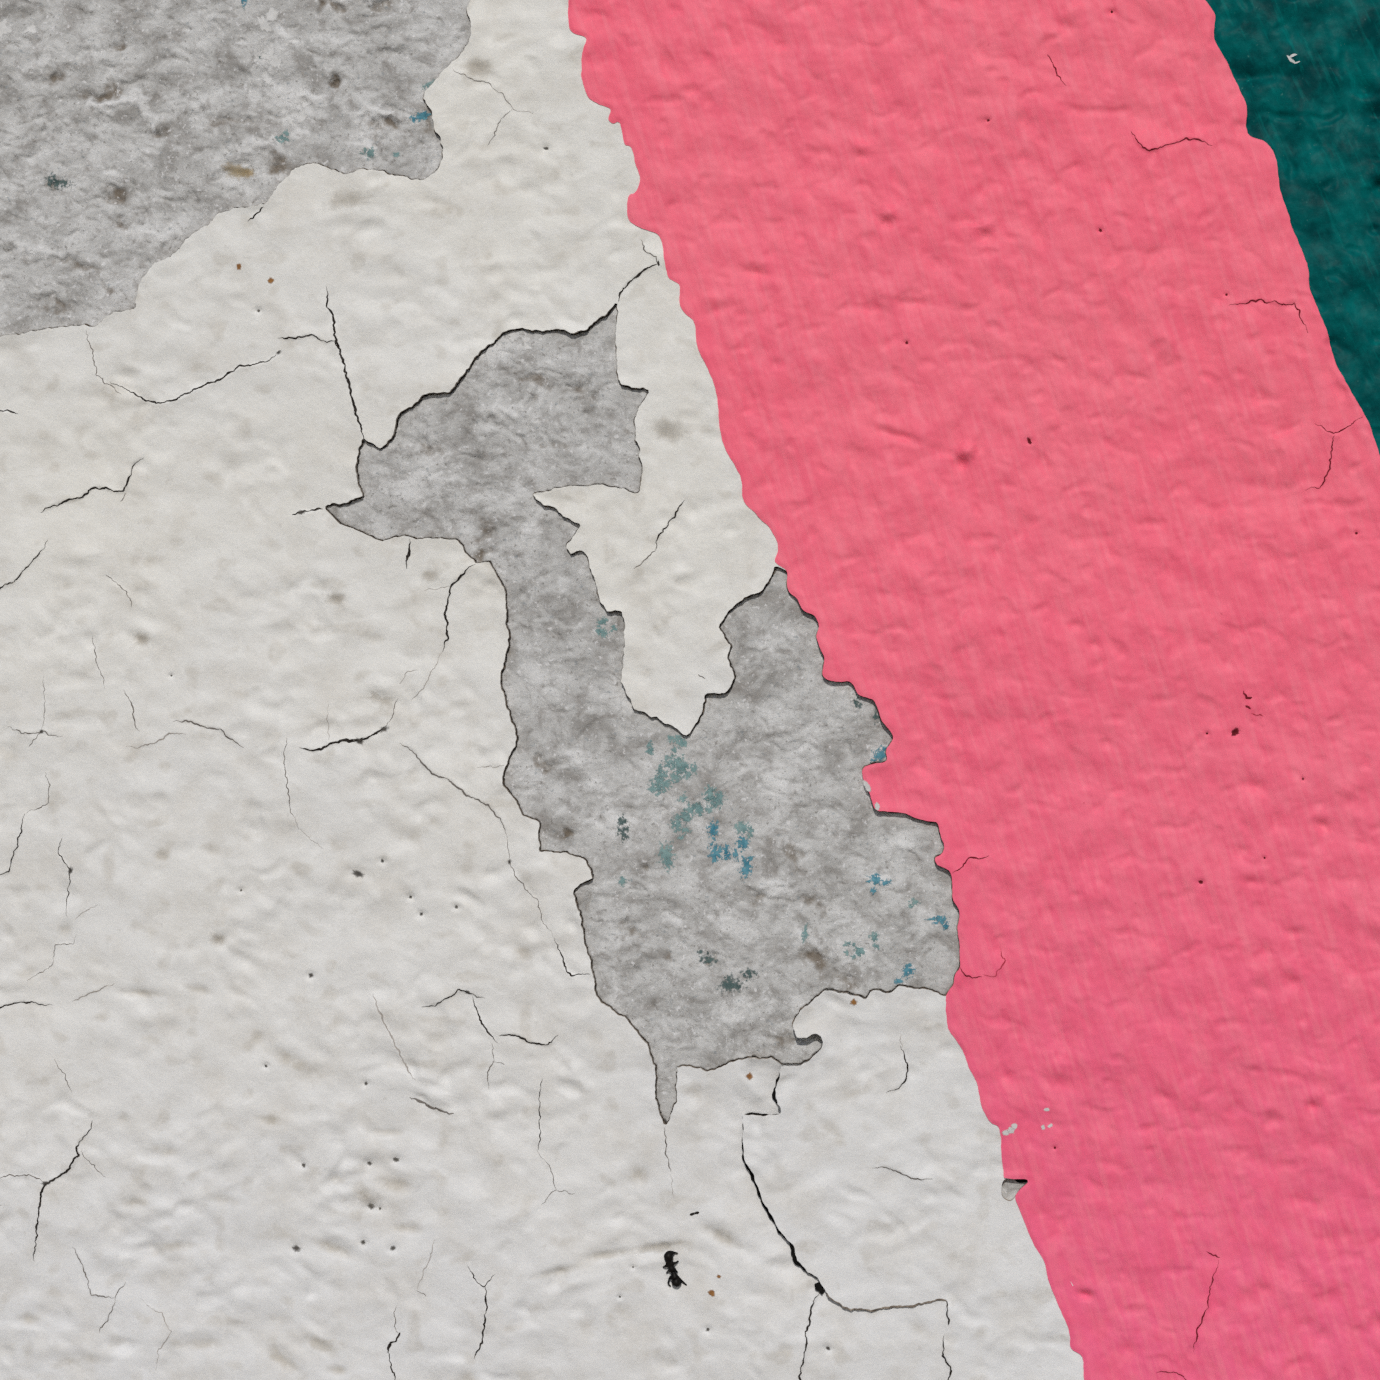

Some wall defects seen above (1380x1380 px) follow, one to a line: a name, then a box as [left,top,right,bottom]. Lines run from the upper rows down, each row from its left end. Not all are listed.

peeling [0,0,471,336]
crack [87,287,364,440]
crack [0,459,141,589]
crack [283,539,585,977]
peeling [327,304,1051,1312]
crack [0,839,115,1008]
crack [425,989,558,1085]
crack [1,1123,105,1259]
crack [742,1073,825,1380]
crack [387,1240,435,1379]
crack [468,1267,495,1358]
crack [942,1301,952,1380]